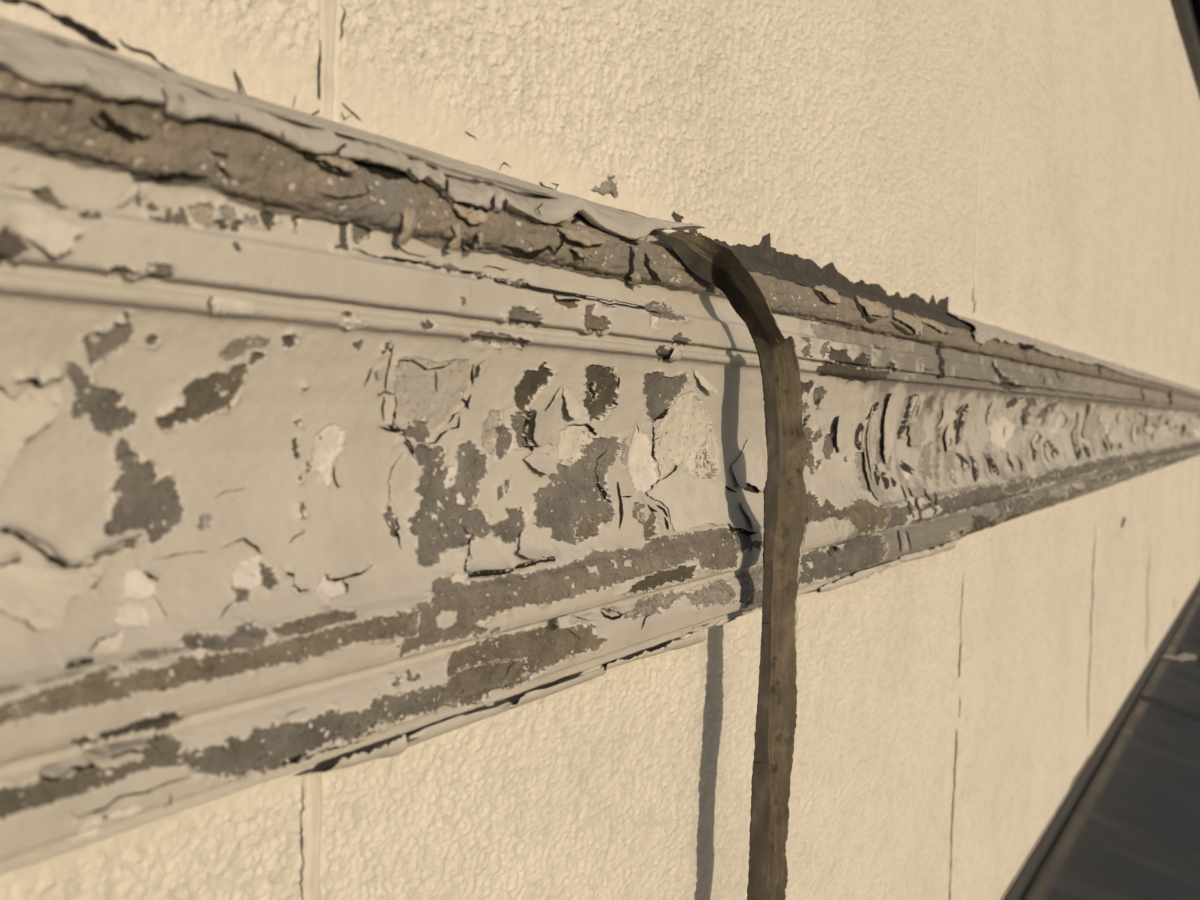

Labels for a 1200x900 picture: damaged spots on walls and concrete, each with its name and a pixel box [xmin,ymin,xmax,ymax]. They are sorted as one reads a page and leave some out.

peeling [0,17,977,900]
peeling [998,375,1063,425]
peeling [881,442,1200,538]
spalling [973,338,1200,411]
crack [1070,523,1096,787]
crack [949,564,967,900]
crack [298,782,306,900]